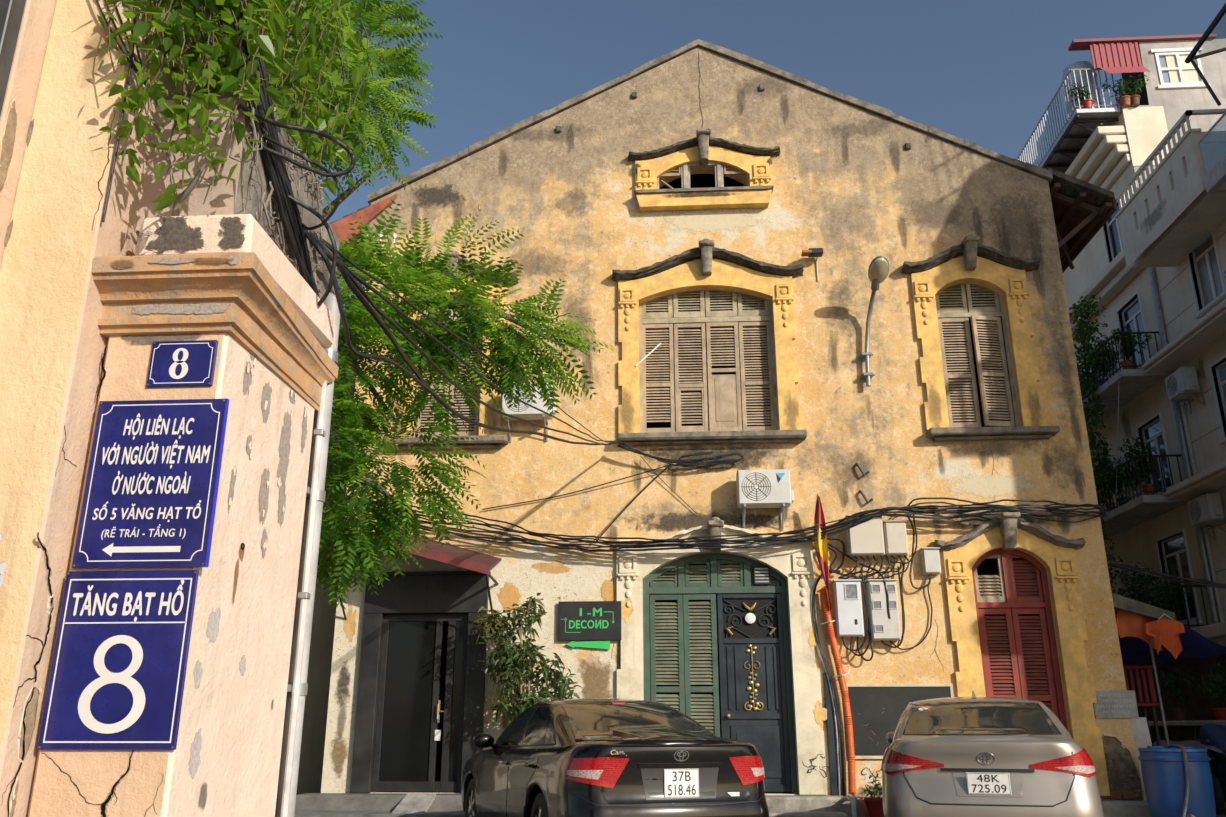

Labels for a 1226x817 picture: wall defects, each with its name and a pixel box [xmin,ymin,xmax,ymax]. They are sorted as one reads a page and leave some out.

damp [412,185,459,227]
peeling [137,217,204,264]
peeling [219,216,247,265]
peeling [243,353,273,423]
peeling [228,466,237,510]
peeling [259,388,307,558]
damp [637,445,770,488]
damp [636,508,787,531]
peeling [531,560,571,575]
peeling [343,601,357,643]
crack [2,532,134,817]